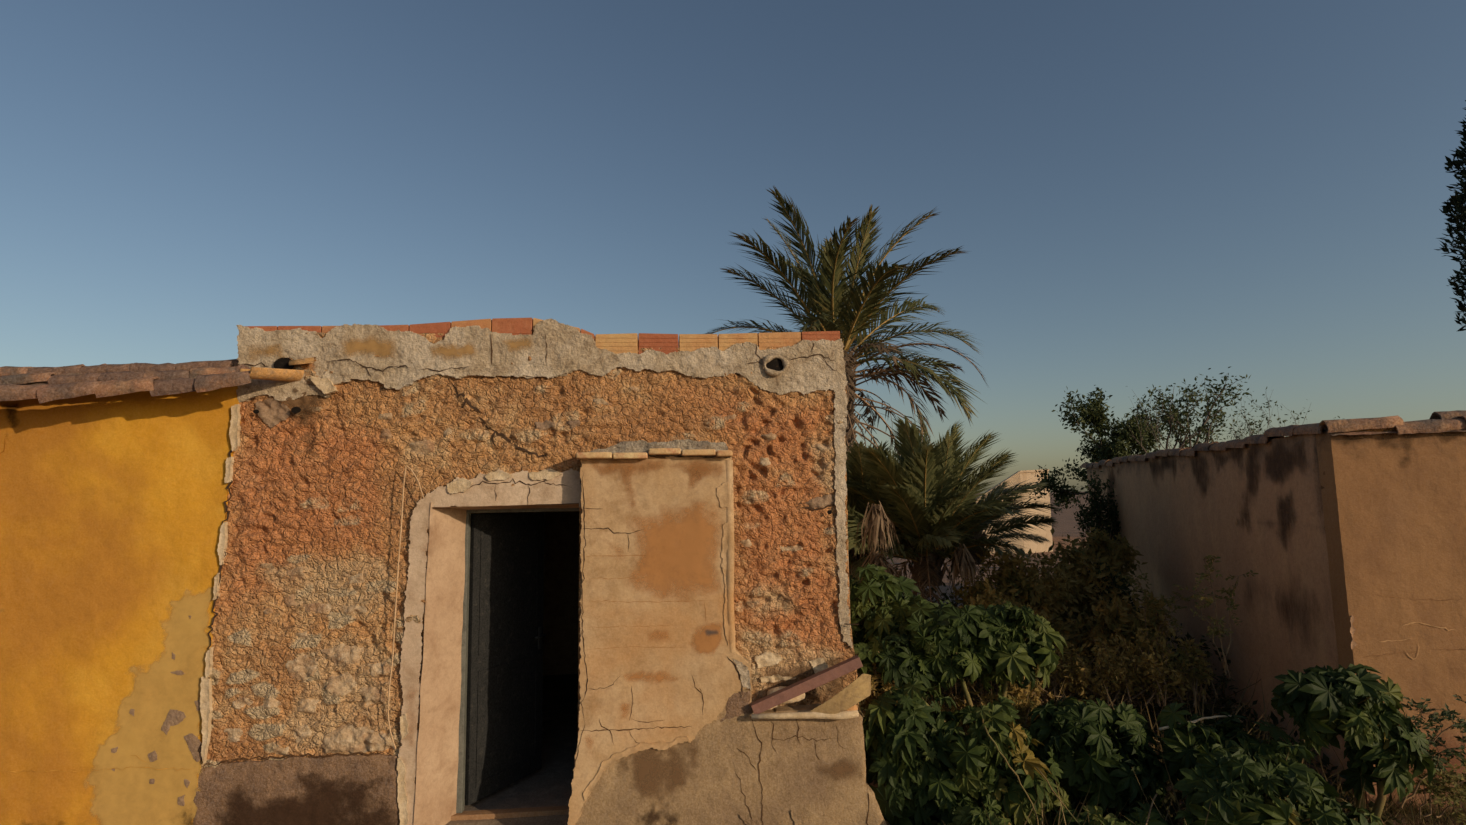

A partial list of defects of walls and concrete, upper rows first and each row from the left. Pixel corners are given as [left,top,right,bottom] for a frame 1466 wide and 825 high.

flaking render [322,360,581,390]
crack [747,341,836,371]
flaking render [224,404,241,483]
water stain [1193,437,1305,493]
crack [327,340,716,768]
water stain [1279,499,1293,542]
peeling [88,522,243,825]
spalling [720,652,796,722]
water stain [219,774,394,825]
spalling [232,643,409,825]
flaking render [583,736,690,800]
crack [727,657,846,823]